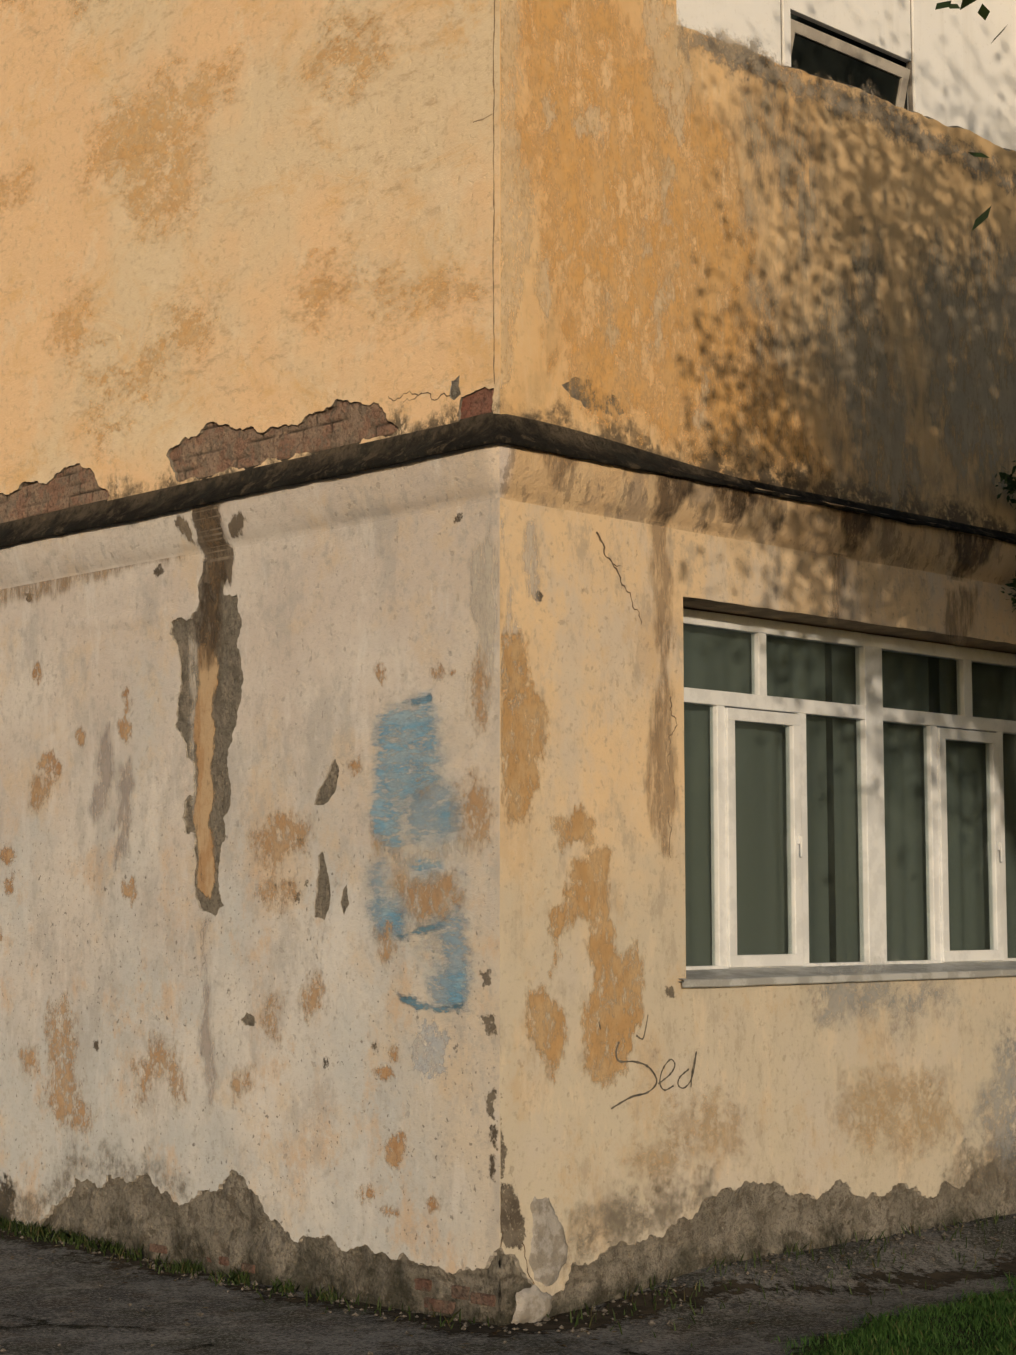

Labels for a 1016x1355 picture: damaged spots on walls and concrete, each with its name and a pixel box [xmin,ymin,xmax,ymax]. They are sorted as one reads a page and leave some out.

flaking render [0,463,110,523]
flaking render [166,399,398,482]
crack [388,392,450,402]
flaking render [449,375,494,420]
leakage [808,245,921,510]
leakage [914,236,1016,486]
crack [596,532,642,624]
leakage [832,510,872,613]
leakage [946,532,994,642]
flaking render [170,505,244,916]
peeling [254,814,349,920]
flaking render [39,1081,1016,1326]